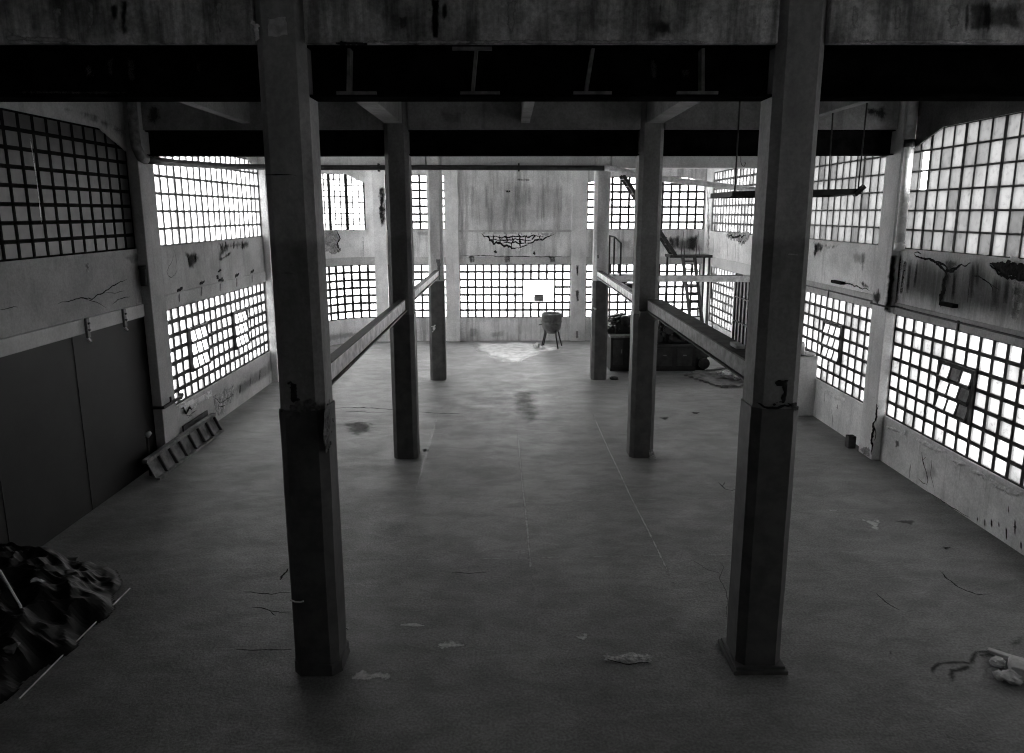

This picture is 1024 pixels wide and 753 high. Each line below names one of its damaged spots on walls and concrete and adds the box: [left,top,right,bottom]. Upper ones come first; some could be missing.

peeling [324,230,341,254]
flaking render [482,232,554,255]
crack [914,251,998,307]
spalling [990,256,1024,282]
crack [58,280,126,308]
crack [870,404,878,455]